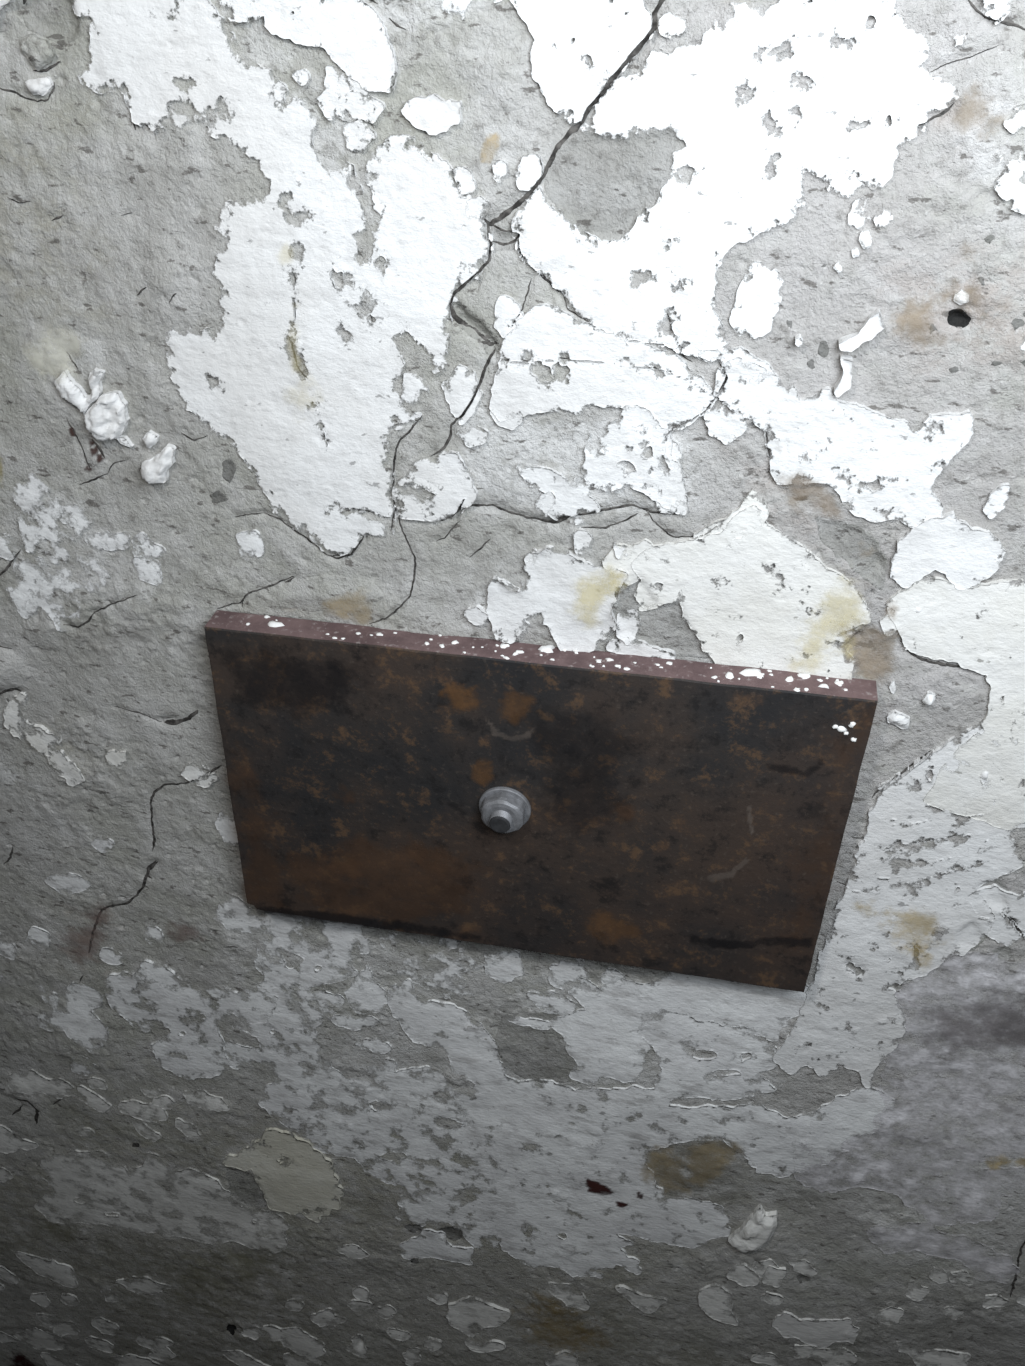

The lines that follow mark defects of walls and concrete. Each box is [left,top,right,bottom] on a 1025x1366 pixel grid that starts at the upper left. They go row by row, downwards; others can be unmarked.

peeling [994,152,1025,215]
crack [236,0,728,624]
peeling [22,0,1011,591]
peeling [0,473,166,631]
peeling [464,490,871,680]
crack [80,765,222,981]
peeling [0,576,1025,1282]
peeling [0,1251,176,1366]
peeling [222,1285,442,1366]
peeling [427,1293,511,1353]
peeling [698,1258,860,1366]
crack [1010,1241,1025,1297]